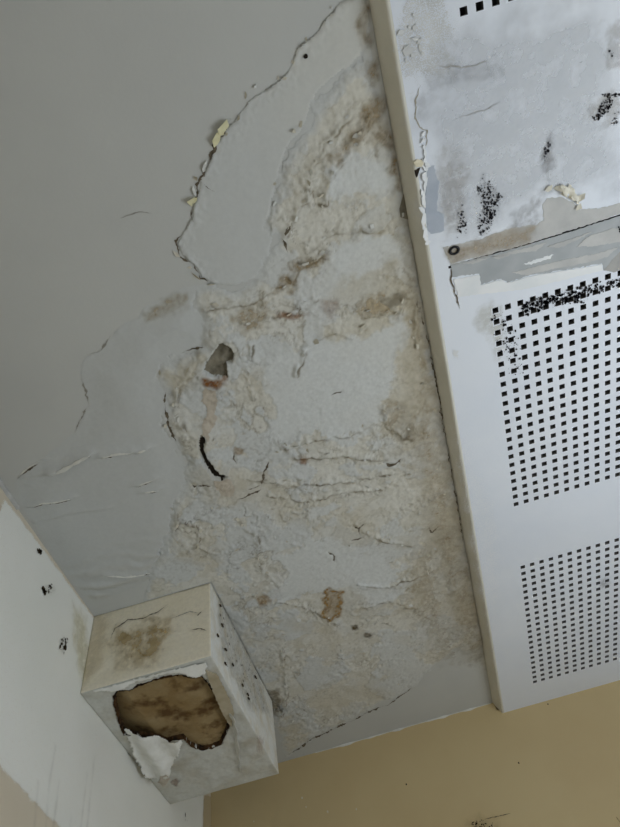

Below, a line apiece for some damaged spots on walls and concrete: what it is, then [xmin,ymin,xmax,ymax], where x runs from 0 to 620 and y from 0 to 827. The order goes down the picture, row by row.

mould [592,93,620,124]
crack [174,129,227,282]
mould [477,174,503,236]
mould [521,278,620,316]
flaking render [93,0,484,758]
crack [163,394,176,440]
crack [193,436,236,488]
crack [237,462,269,500]
leakage [118,625,167,658]
crack [111,607,205,636]
leakage [322,588,344,622]
leakage [224,651,280,710]